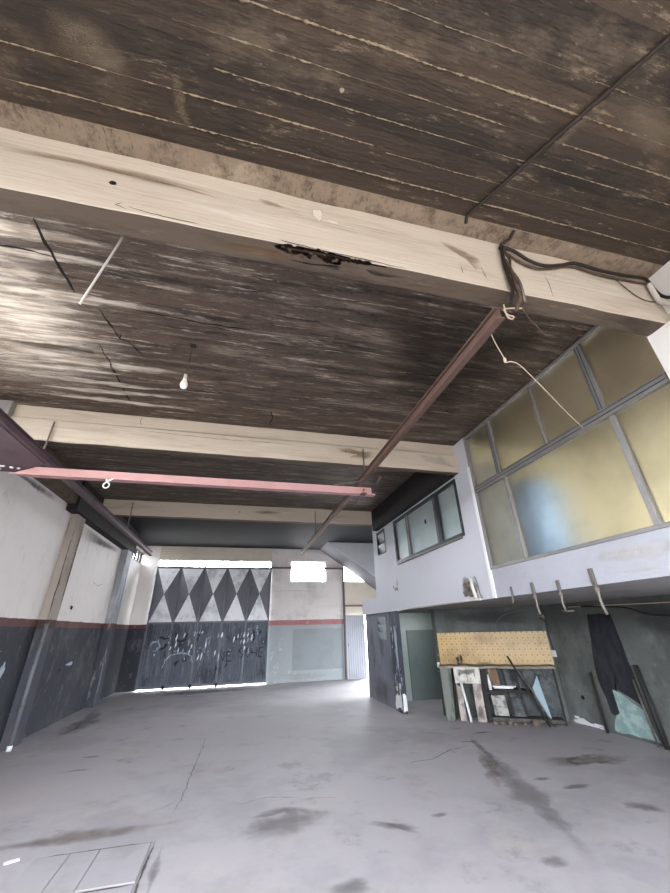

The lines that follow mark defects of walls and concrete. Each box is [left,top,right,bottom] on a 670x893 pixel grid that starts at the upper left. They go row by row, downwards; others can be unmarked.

spalling [275,240,406,274]
crack [0,218,284,444]
crack [154,739,206,812]